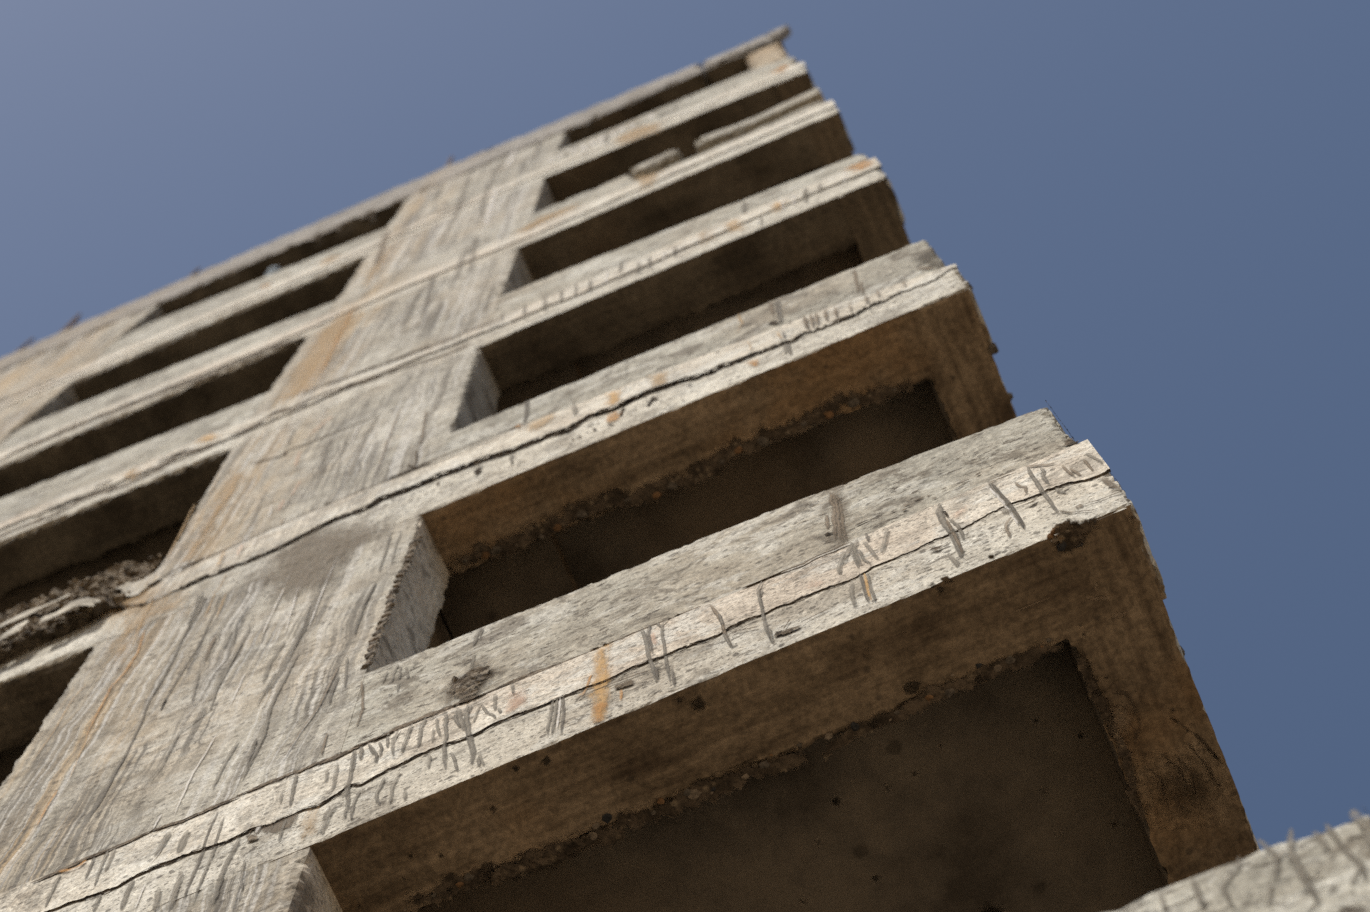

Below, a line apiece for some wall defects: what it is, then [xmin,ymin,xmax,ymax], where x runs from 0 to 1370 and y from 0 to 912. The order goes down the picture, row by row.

crack [129,274,943,608]
spalling [0,554,166,664]
water stain [90,525,401,816]
crack [65,478,1122,905]
rust [578,645,622,718]
water stain [85,848,116,911]
water stain [120,736,245,910]
water stain [278,774,298,841]